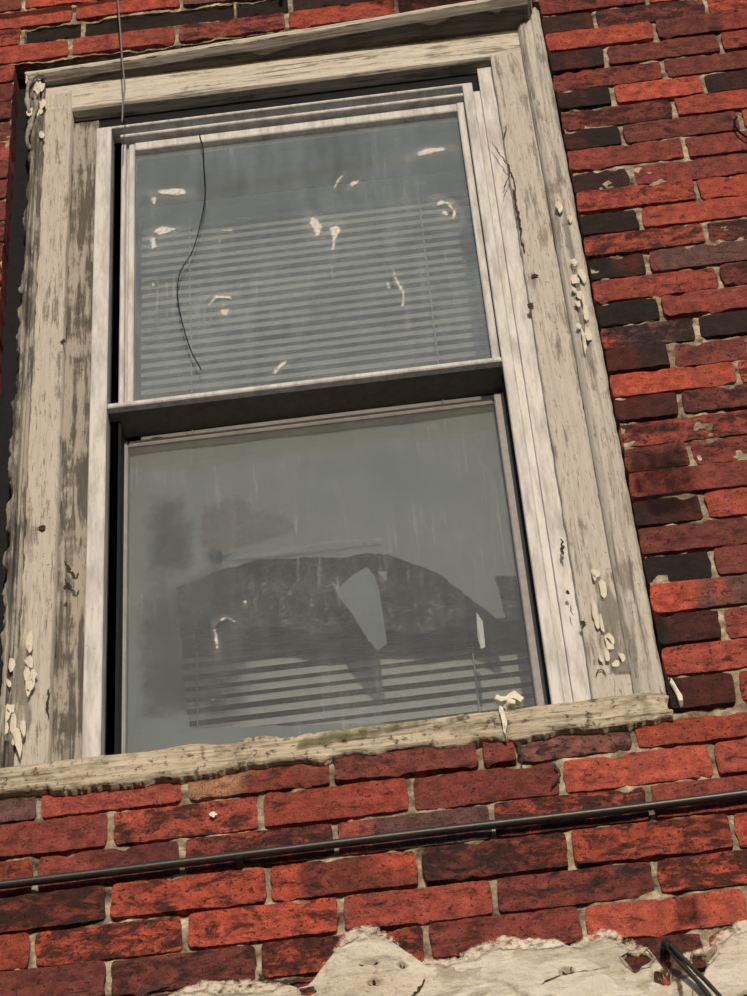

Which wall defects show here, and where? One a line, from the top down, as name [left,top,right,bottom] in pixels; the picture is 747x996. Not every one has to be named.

peeling [591,569,630,672]
peeling [5,630,38,757]
flaking render [619,949,656,973]
crack [259,974,313,984]
crack [412,979,425,996]